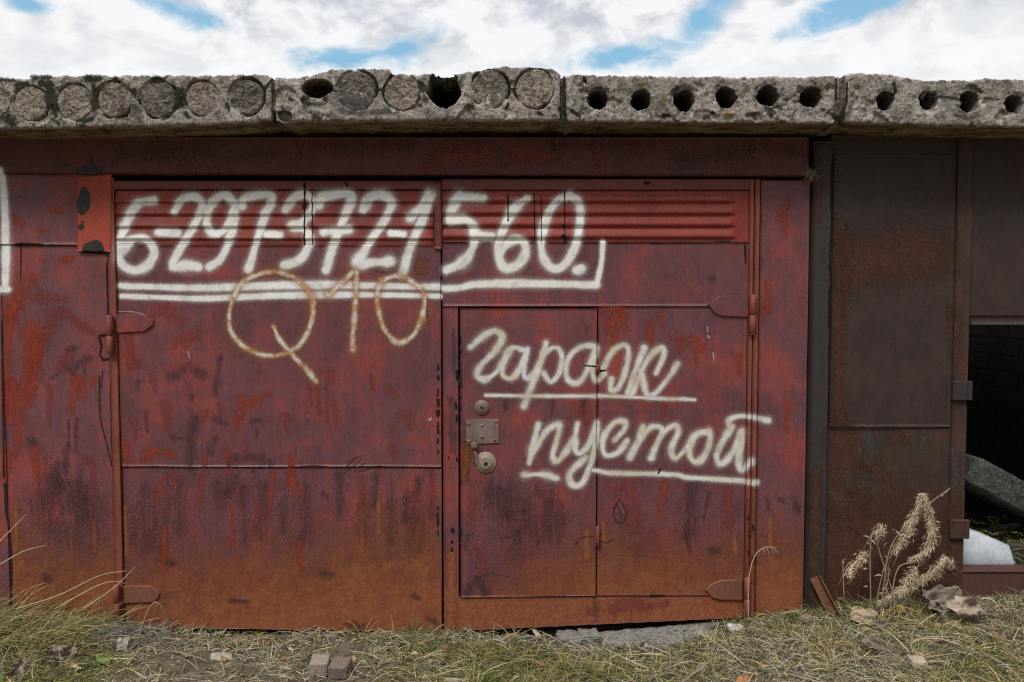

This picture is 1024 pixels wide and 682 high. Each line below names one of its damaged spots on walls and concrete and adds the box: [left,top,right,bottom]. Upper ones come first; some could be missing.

spalling [277,97,323,123]
spalling [745,106,776,120]